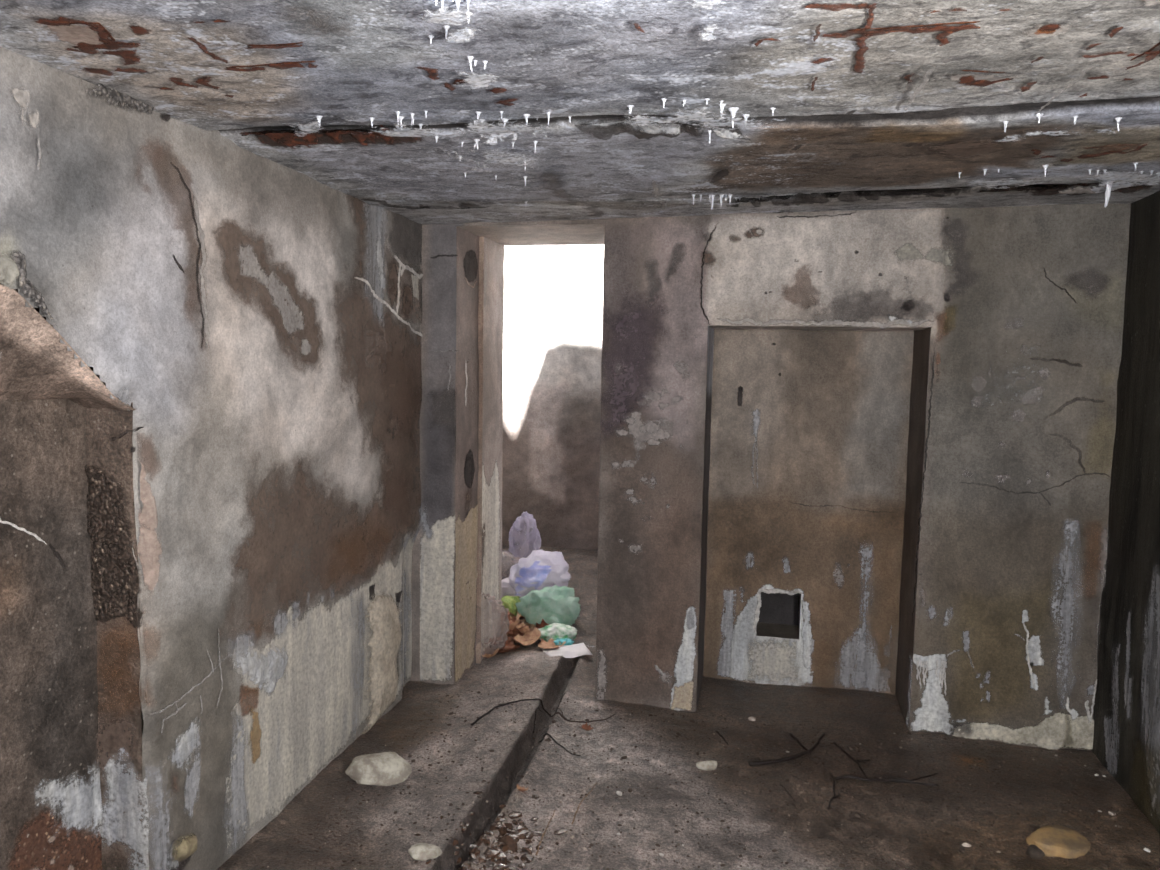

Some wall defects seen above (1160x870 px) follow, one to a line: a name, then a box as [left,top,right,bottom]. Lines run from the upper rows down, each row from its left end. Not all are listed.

efflorescence [456,56,499,90]
damp [282,116,324,137]
efflorescence [368,111,551,186]
damp [624,98,783,143]
crack [173,165,209,345]
crack [354,254,467,405]
crack [1031,358,1081,367]
crack [1063,397,1104,407]
crack [994,449,1109,506]
crack [0,519,66,568]
damp [215,195,500,848]
spalling [240,687,261,763]